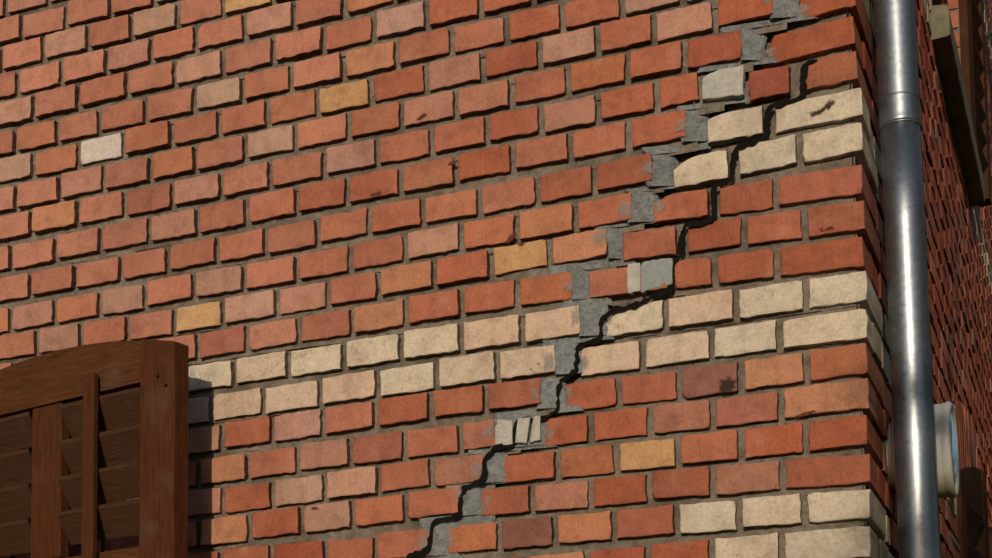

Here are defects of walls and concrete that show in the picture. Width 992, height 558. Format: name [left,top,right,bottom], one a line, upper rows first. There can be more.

crack [406,0,818,558]